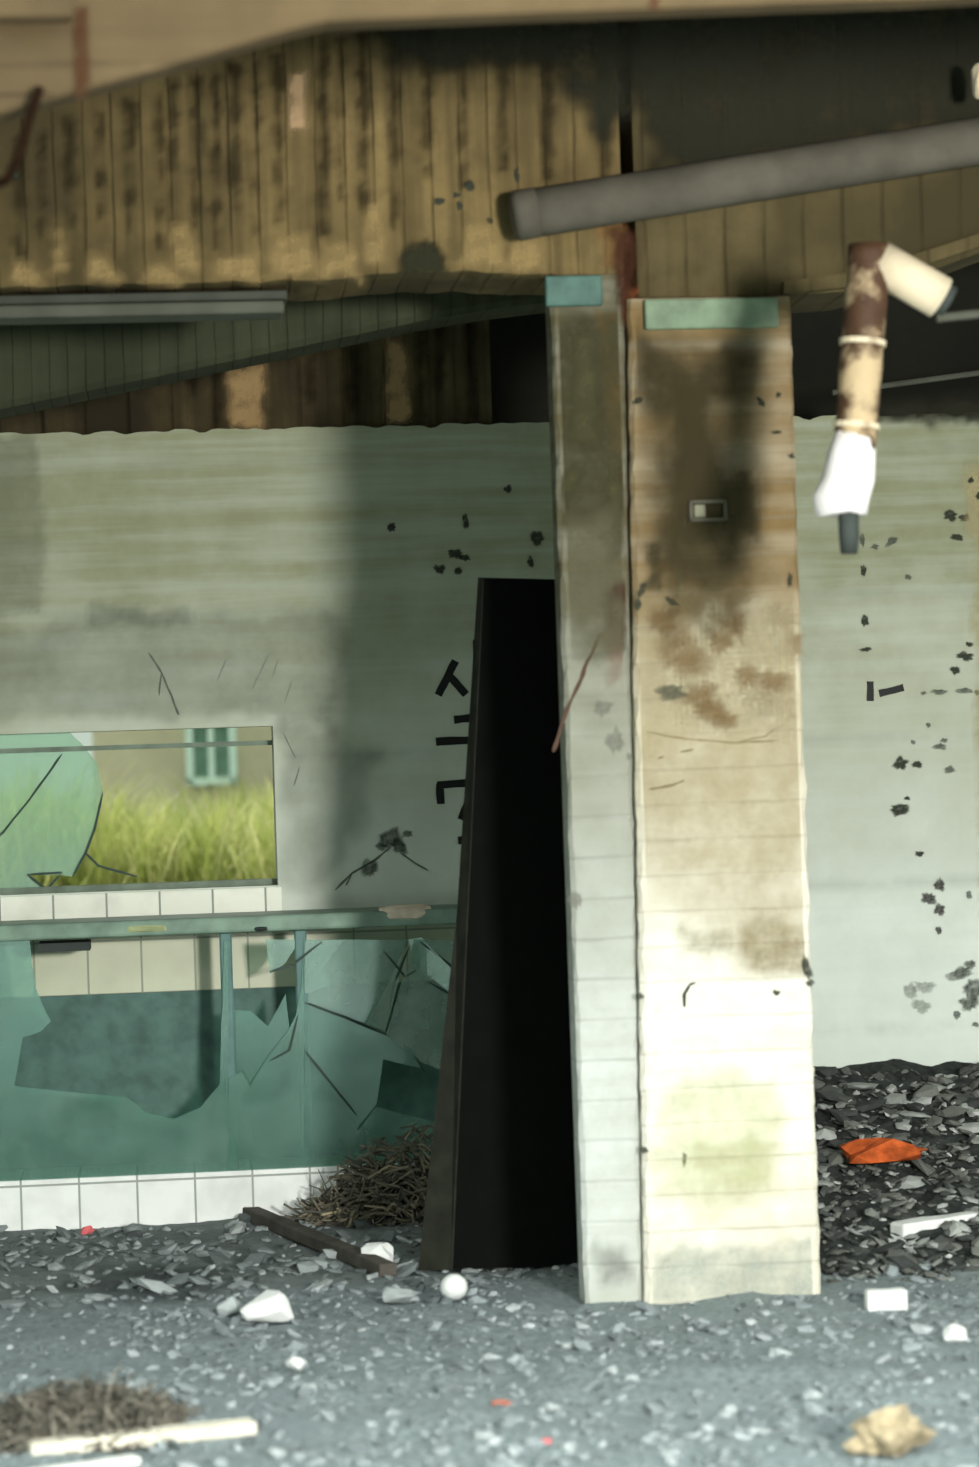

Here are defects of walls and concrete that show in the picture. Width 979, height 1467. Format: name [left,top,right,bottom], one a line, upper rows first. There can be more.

damp [640,345,756,588]
spalling [944,510,969,540]
spalling [433,549,470,574]
crack [149,653,179,715]
damp [660,683,697,699]
spalling [921,642,979,695]
spalling [894,740,922,769]
spalling [891,796,910,816]
crack [335,849,429,890]
spalling [922,879,945,934]
spalling [802,957,814,986]
spalling [951,961,979,1027]